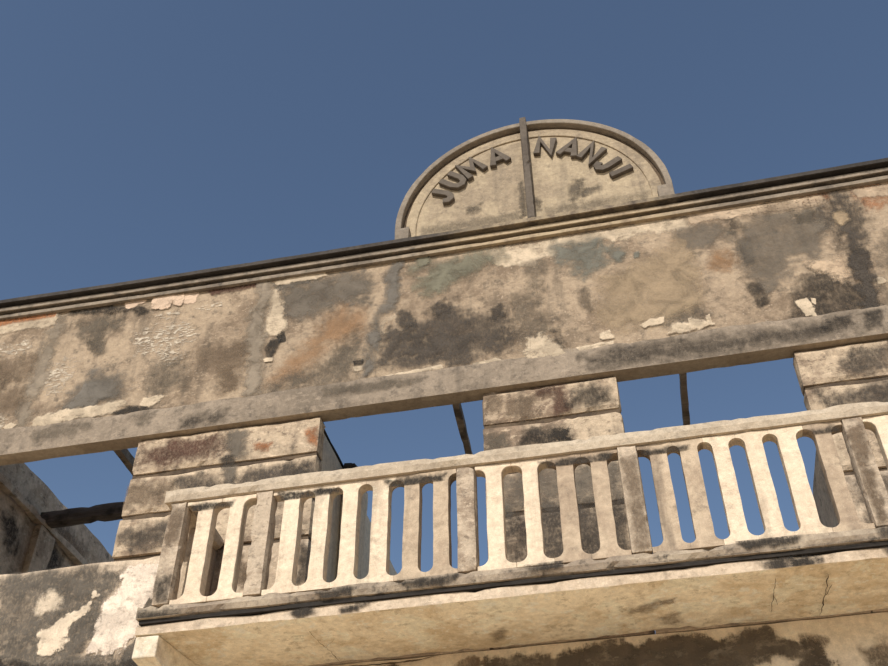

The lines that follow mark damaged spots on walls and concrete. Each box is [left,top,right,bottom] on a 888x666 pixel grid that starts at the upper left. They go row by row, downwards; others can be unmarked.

leakage [678,224,723,248]
leakage [727,183,882,346]
flaking render [125,292,222,366]
leakage [274,270,373,320]
leakage [377,251,559,368]
flaking render [641,314,715,334]
spalling [795,298,817,316]
leakage [268,335,415,394]
leakage [812,380,888,407]
leakage [840,347,888,373]
leakage [0,527,138,666]
flaking render [35,561,158,656]